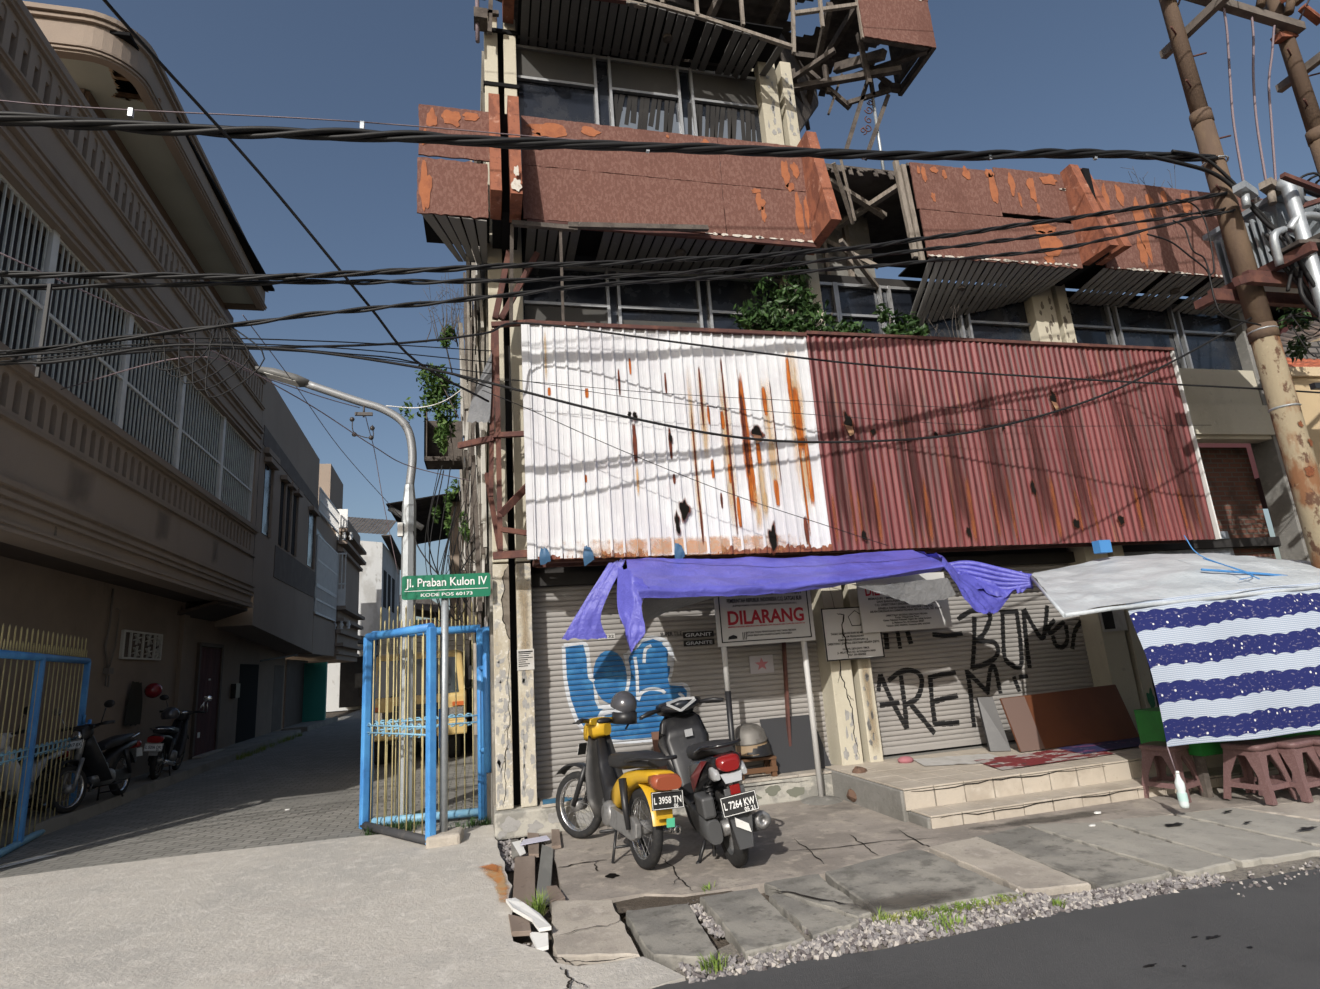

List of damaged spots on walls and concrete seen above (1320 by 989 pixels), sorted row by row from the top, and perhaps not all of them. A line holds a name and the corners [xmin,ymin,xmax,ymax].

peeling [766,73,799,136]
rust [538,358,882,560]
rust [901,407,933,538]
rust [934,424,977,538]
rust [979,395,1018,537]
rust [1027,389,1100,536]
rust [1117,408,1158,529]
crack [550,919,631,989]